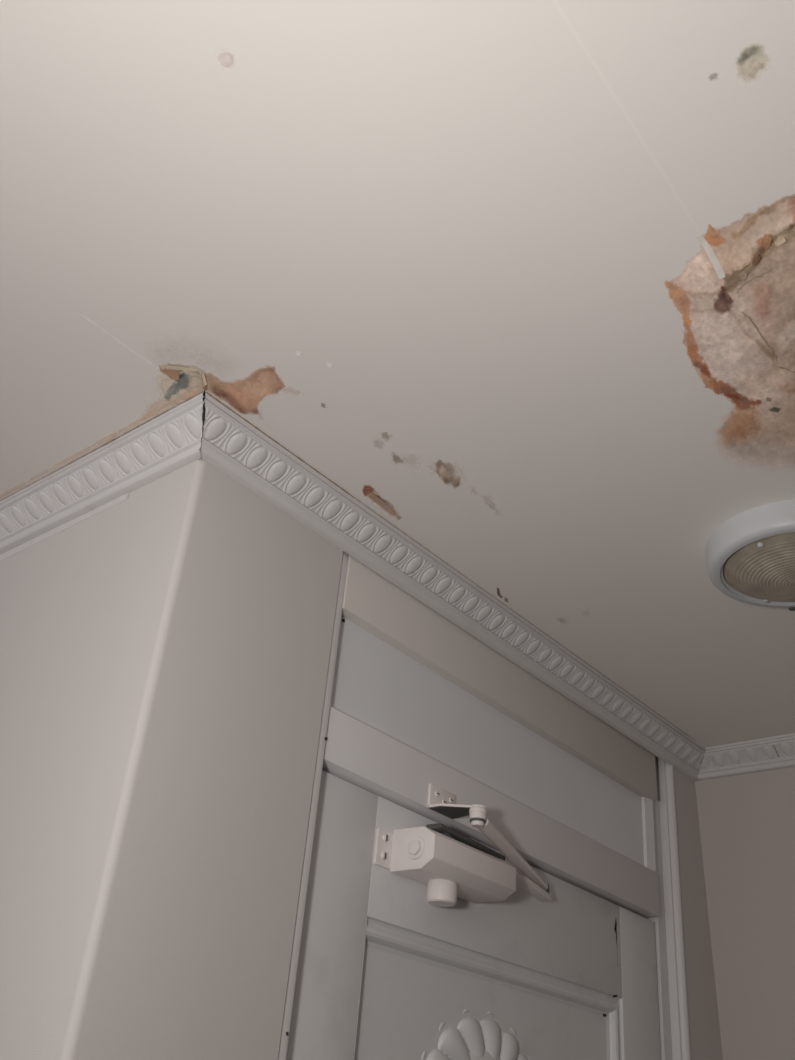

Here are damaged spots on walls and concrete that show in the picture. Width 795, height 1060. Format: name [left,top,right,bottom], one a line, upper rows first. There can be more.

peeling [696,224,795,291]
peeling [159,364,207,404]
peeling [363,485,401,520]